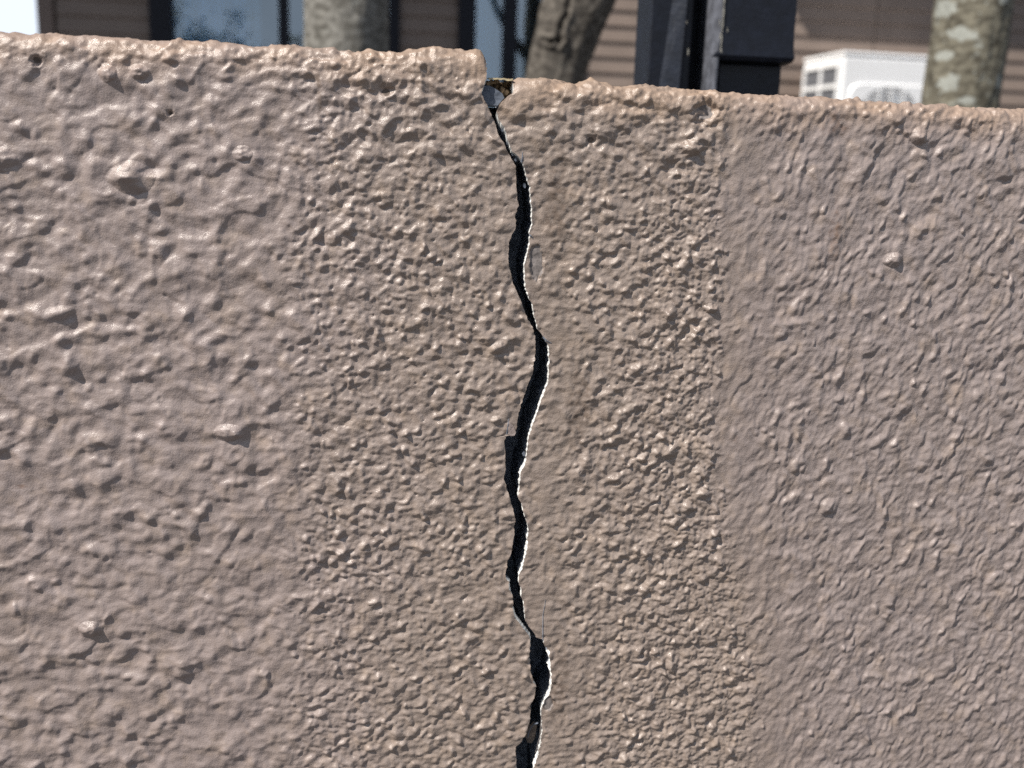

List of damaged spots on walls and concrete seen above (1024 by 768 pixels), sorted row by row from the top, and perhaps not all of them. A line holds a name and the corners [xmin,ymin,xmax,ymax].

crack [481,70,552,768]